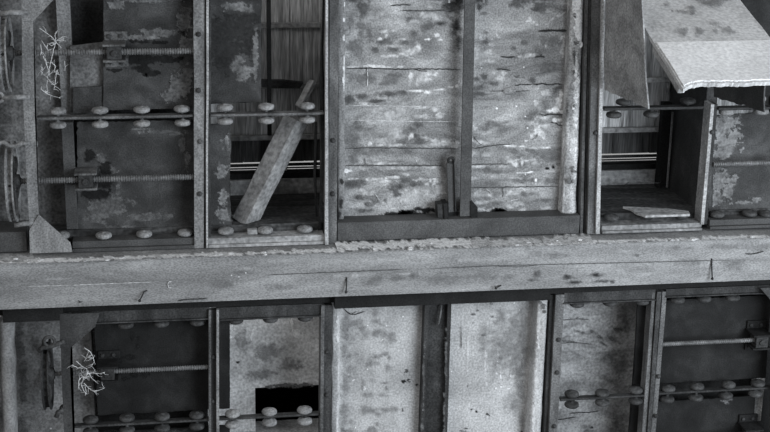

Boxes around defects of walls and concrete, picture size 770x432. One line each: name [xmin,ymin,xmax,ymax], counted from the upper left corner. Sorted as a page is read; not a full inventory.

peeling [107,0,193,49]
peeling [221,1,254,13]
water stain [510,0,563,26]
peeling [158,59,194,104]
peeling [230,27,259,89]
crack [345,65,461,73]
water stain [344,0,463,213]
water stain [474,34,517,96]
crack [346,137,510,166]
water stain [471,78,563,212]
peeling [712,114,763,207]
water stain [342,313,393,396]